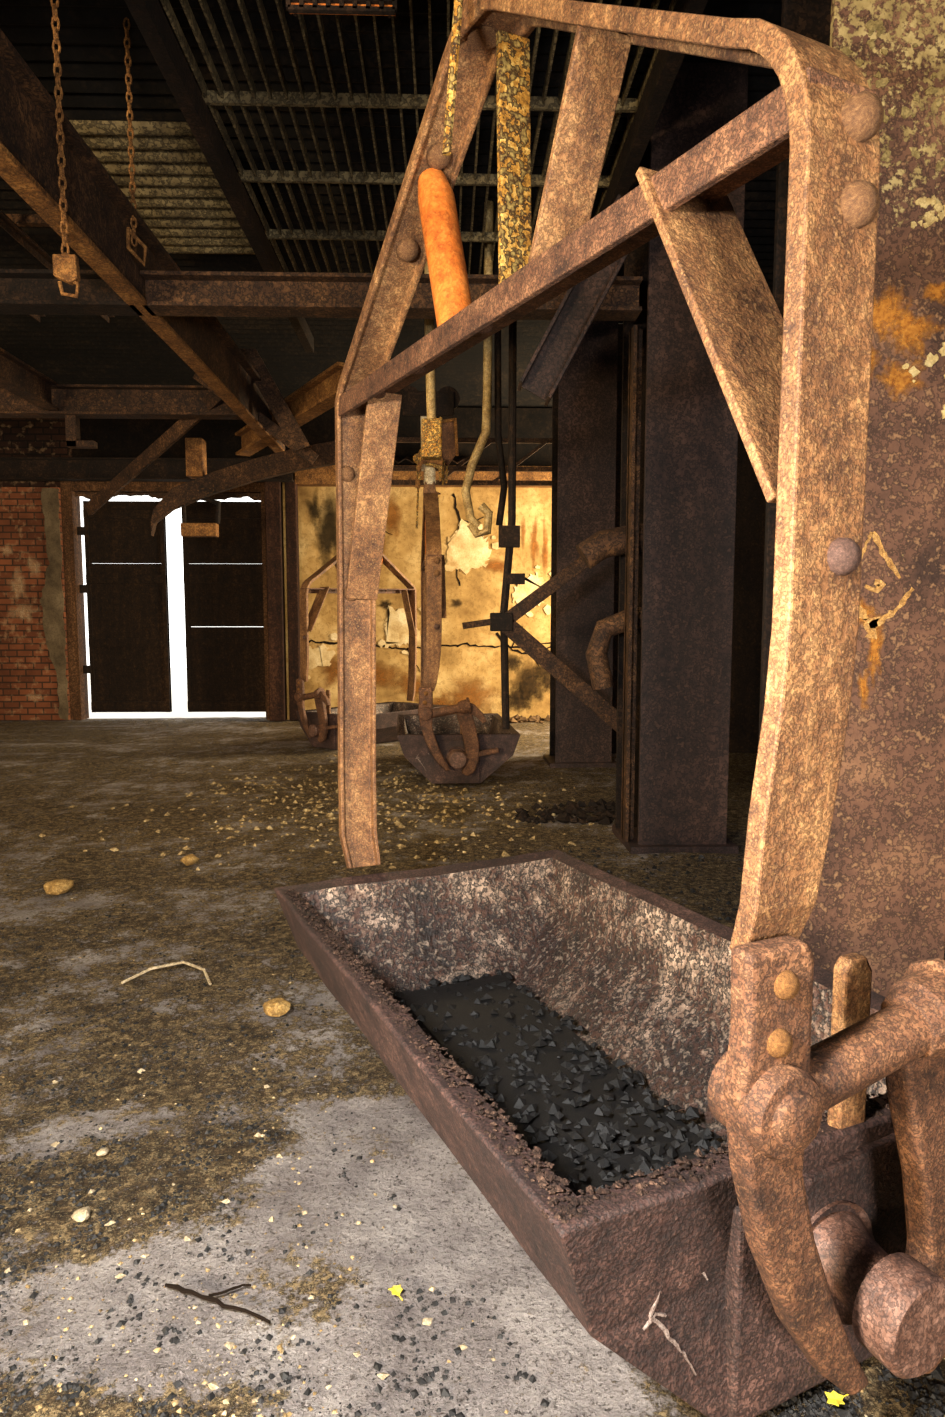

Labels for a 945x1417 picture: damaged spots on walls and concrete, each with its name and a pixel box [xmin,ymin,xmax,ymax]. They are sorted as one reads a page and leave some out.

rust [926,283,945,299]
rust [873,293,937,353]
rust [871,351,920,393]
leakage [308,497,337,560]
leakage [387,500,400,529]
rust [859,603,882,698]
leakage [325,660,337,684]
leakage [376,665,420,694]
leakage [433,681,490,708]
leakage [508,656,550,710]